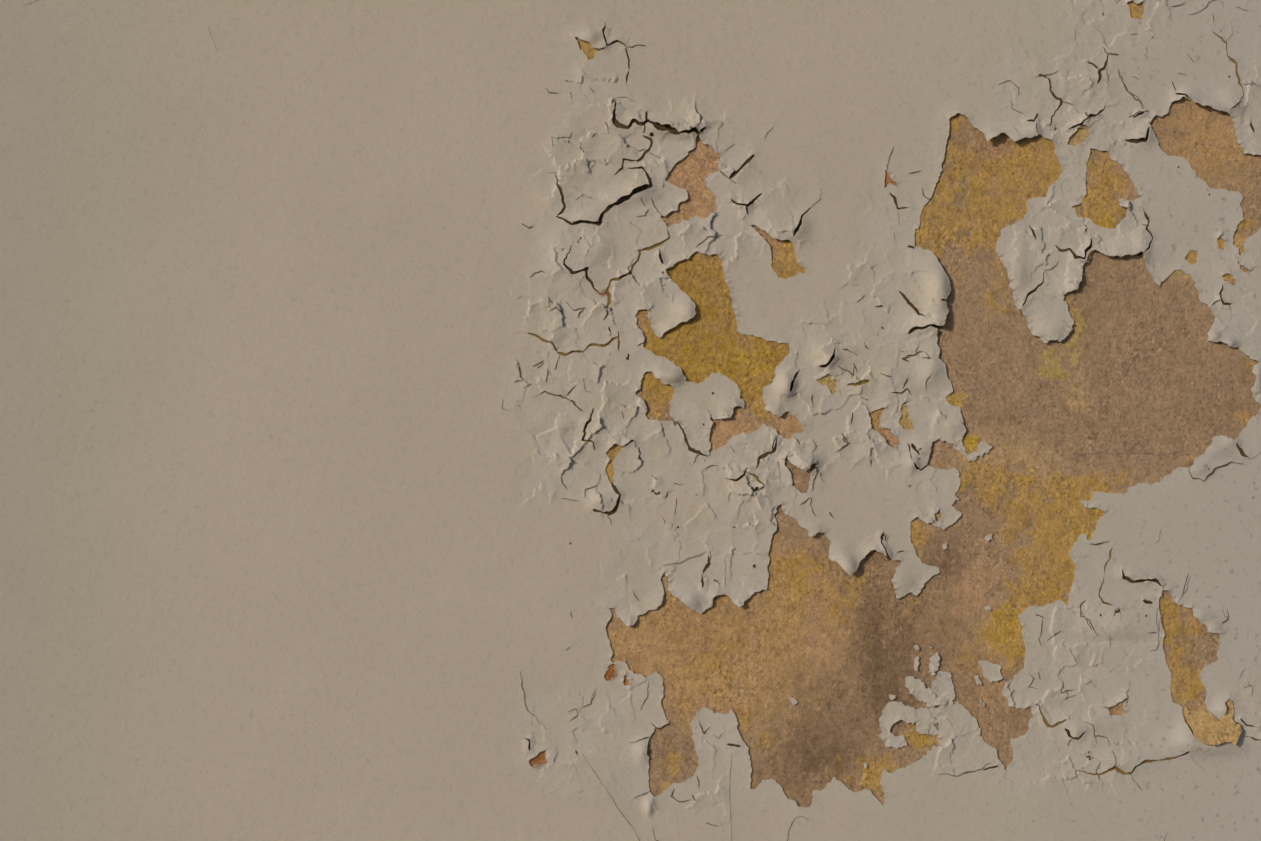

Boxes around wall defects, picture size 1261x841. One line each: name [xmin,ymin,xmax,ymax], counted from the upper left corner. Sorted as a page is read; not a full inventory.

peeling [574,26,607,60]
peeling [1143,59,1261,286]
peeling [586,440,634,512]
peeling [604,107,1261,807]
crack [1239,669,1261,740]
peeling [529,750,547,767]